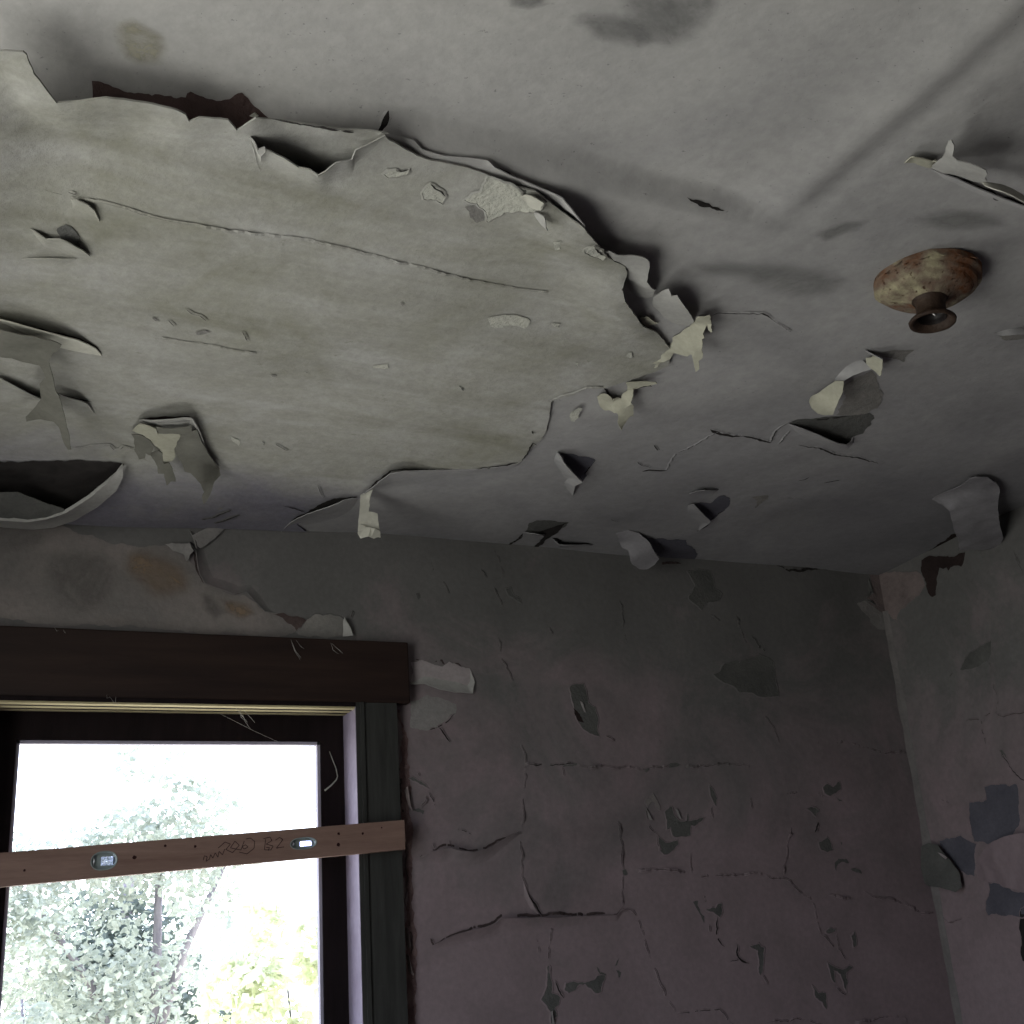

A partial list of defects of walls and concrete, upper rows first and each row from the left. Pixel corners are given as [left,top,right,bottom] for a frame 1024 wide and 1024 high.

spalling [92,81,354,133]
crack [44,189,548,293]
flaking render [250,134,586,250]
peeling [904,139,1024,210]
flaking render [548,245,713,430]
flaking render [0,318,355,639]
peeling [554,452,595,495]
crack [636,422,879,472]
peeling [789,350,914,450]
spalling [397,659,630,1024]
crack [519,743,750,917]
crack [617,821,971,1024]